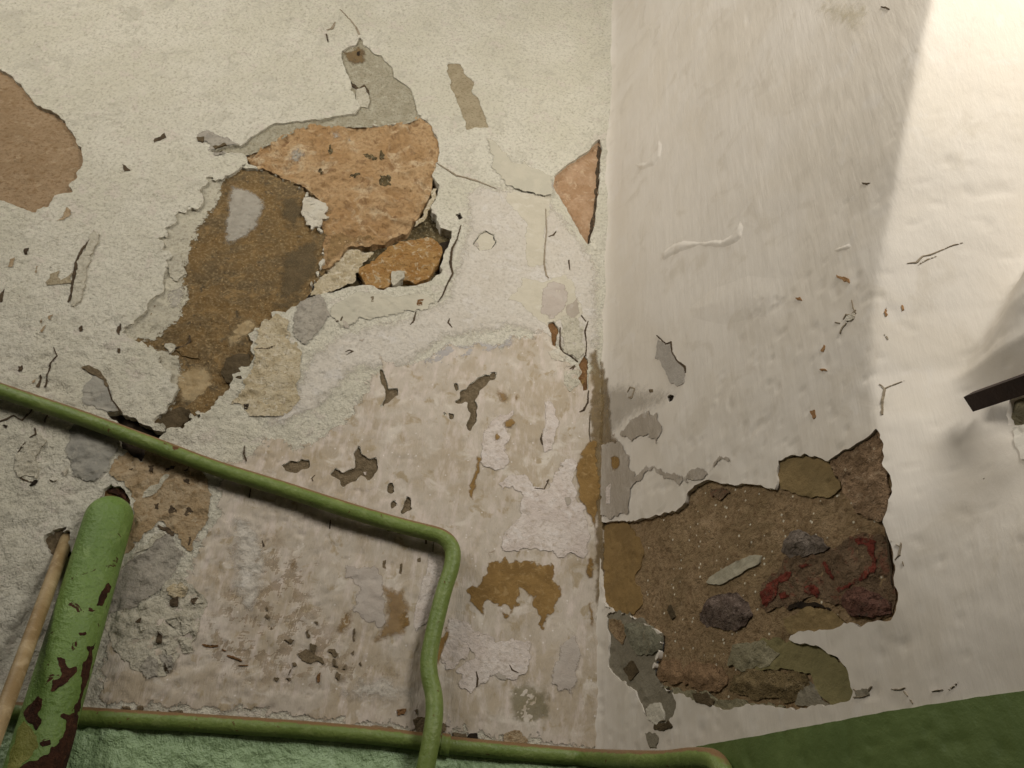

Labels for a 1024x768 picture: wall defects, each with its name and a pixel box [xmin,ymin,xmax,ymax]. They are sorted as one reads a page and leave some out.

spalling [0,71,83,213]
crack [46,230,100,307]
spalling [81,39,451,438]
crack [410,225,461,327]
crack [436,162,496,189]
crack [908,244,958,264]
peeling [223,64,898,748]
peeling [14,424,445,732]